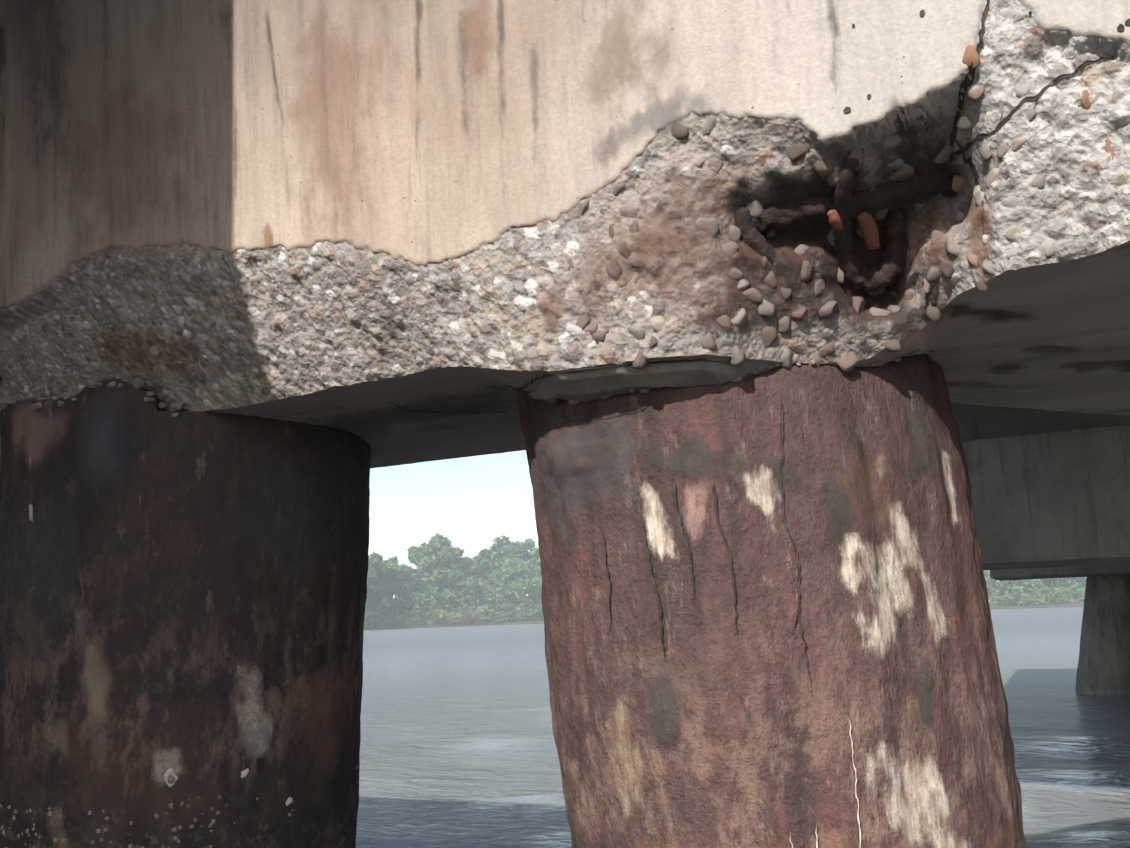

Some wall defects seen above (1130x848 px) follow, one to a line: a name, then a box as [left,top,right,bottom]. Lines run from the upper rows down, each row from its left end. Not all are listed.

spalling [0,0,1130,412]
rust [735,165,836,209]
rust [698,194,945,336]
rust [896,106,961,177]
rust [966,202,989,271]
crack [950,0,1120,232]
leakage [643,487,673,557]
crack [712,485,738,630]
crack [780,401,811,679]
leakage [827,481,943,652]
leakage [942,454,957,522]
leakage [892,762,948,839]